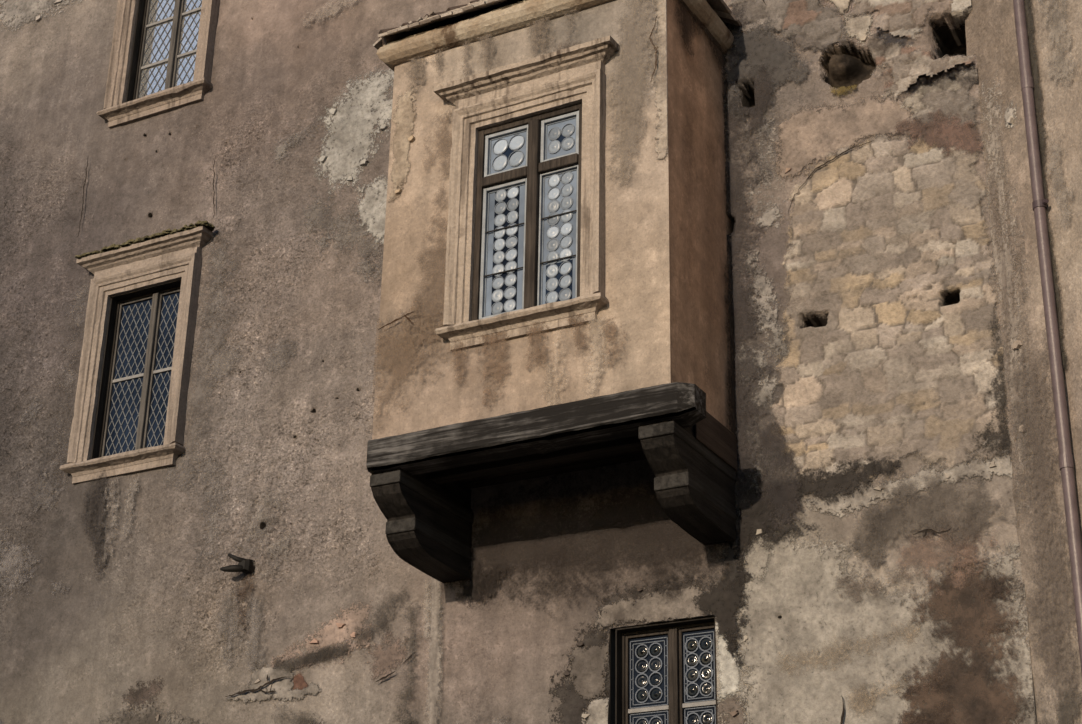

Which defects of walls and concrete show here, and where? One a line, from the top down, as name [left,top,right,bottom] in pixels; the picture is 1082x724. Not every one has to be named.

crack [649,16,657,81]
flaking render [313,68,417,243]
flaking render [727,0,1048,527]
water stain [692,0,1082,724]
water stain [79,475,138,579]
flaking render [225,599,372,704]
flaking render [548,574,719,724]
flaking render [715,528,1036,724]